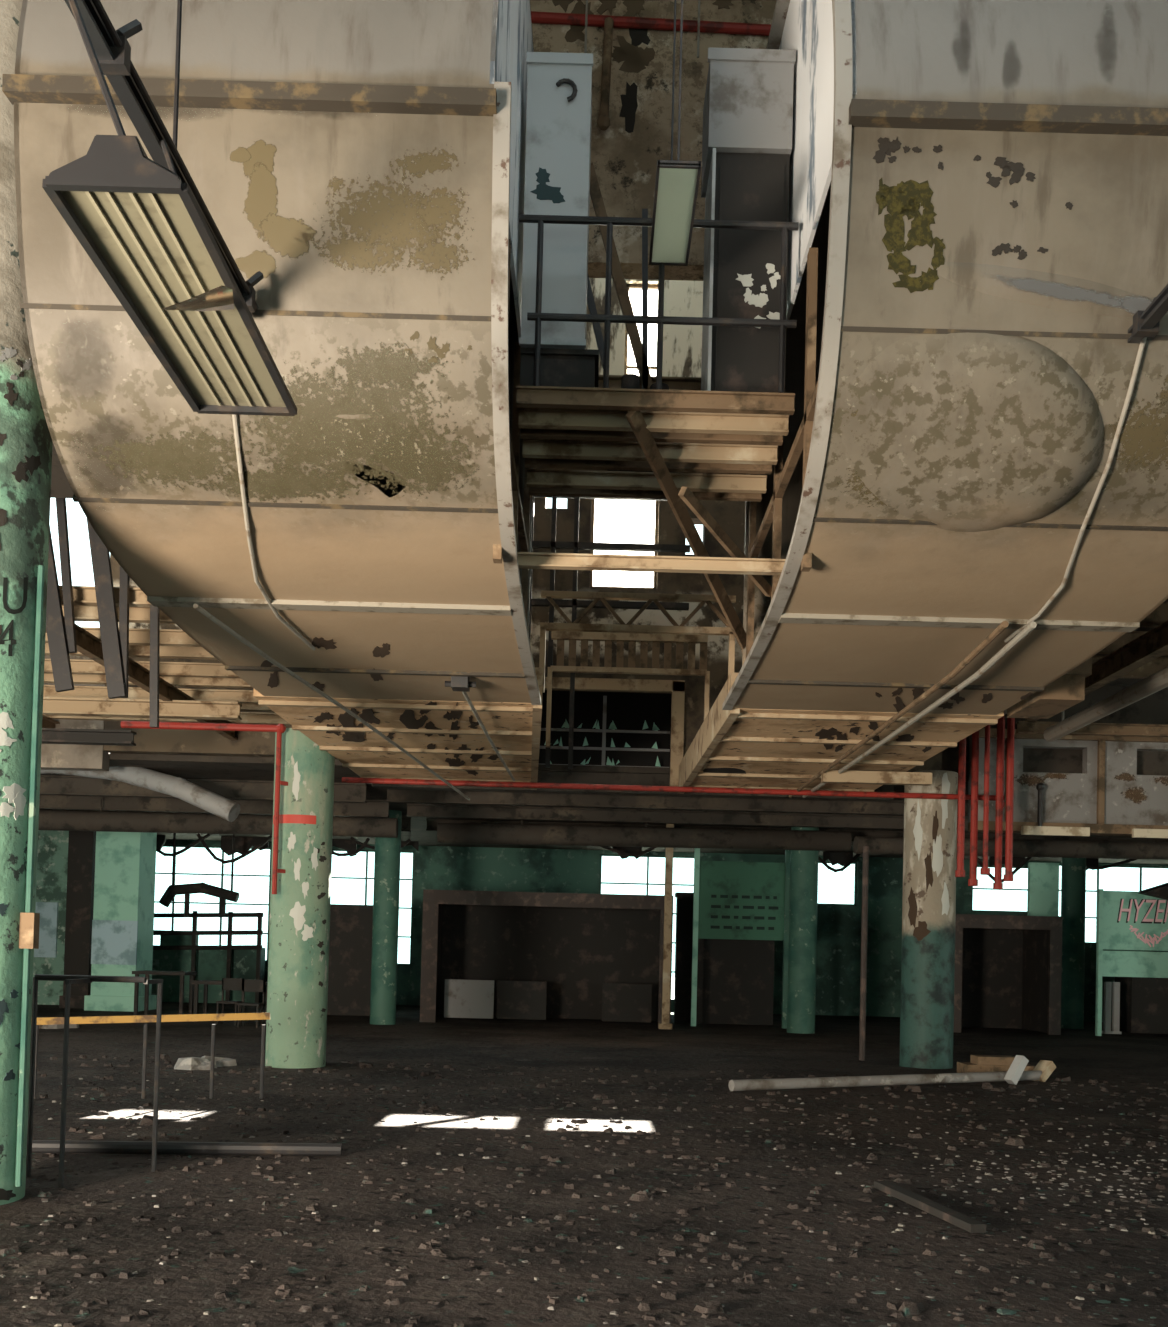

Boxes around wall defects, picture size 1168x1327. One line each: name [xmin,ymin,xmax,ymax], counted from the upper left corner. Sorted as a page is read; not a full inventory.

peeling [552,0,655,133]
peeling [973,155,1036,208]
peeling [873,137,945,293]
peeling [992,243,1048,260]
peeling [735,263,781,329]
peeling [12,455,41,483]
peeling [312,637,337,650]
peeling [370,643,390,681]
peeling [0,712,17,752]
peeling [314,701,499,776]
peeling [0,783,26,820]
peeling [908,773,950,941]